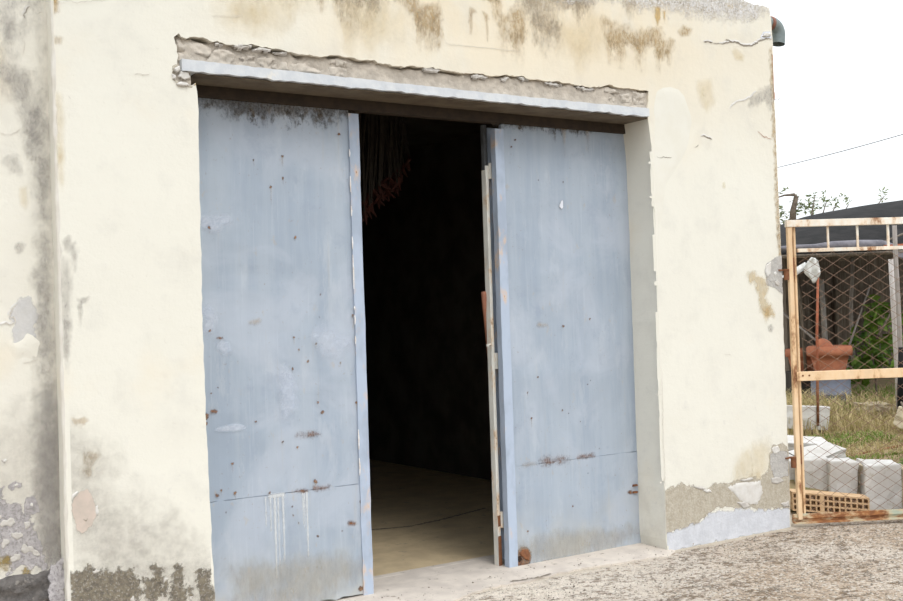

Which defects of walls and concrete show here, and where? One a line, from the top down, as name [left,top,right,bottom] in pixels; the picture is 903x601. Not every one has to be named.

leakage [604,22,671,54]
crack [704,38,772,46]
spalling [171,36,648,108]
spalling [765,255,783,294]
peeling [0,297,38,343]
peeling [665,443,790,550]
peeling [0,481,215,601]
rust [518,547,531,566]